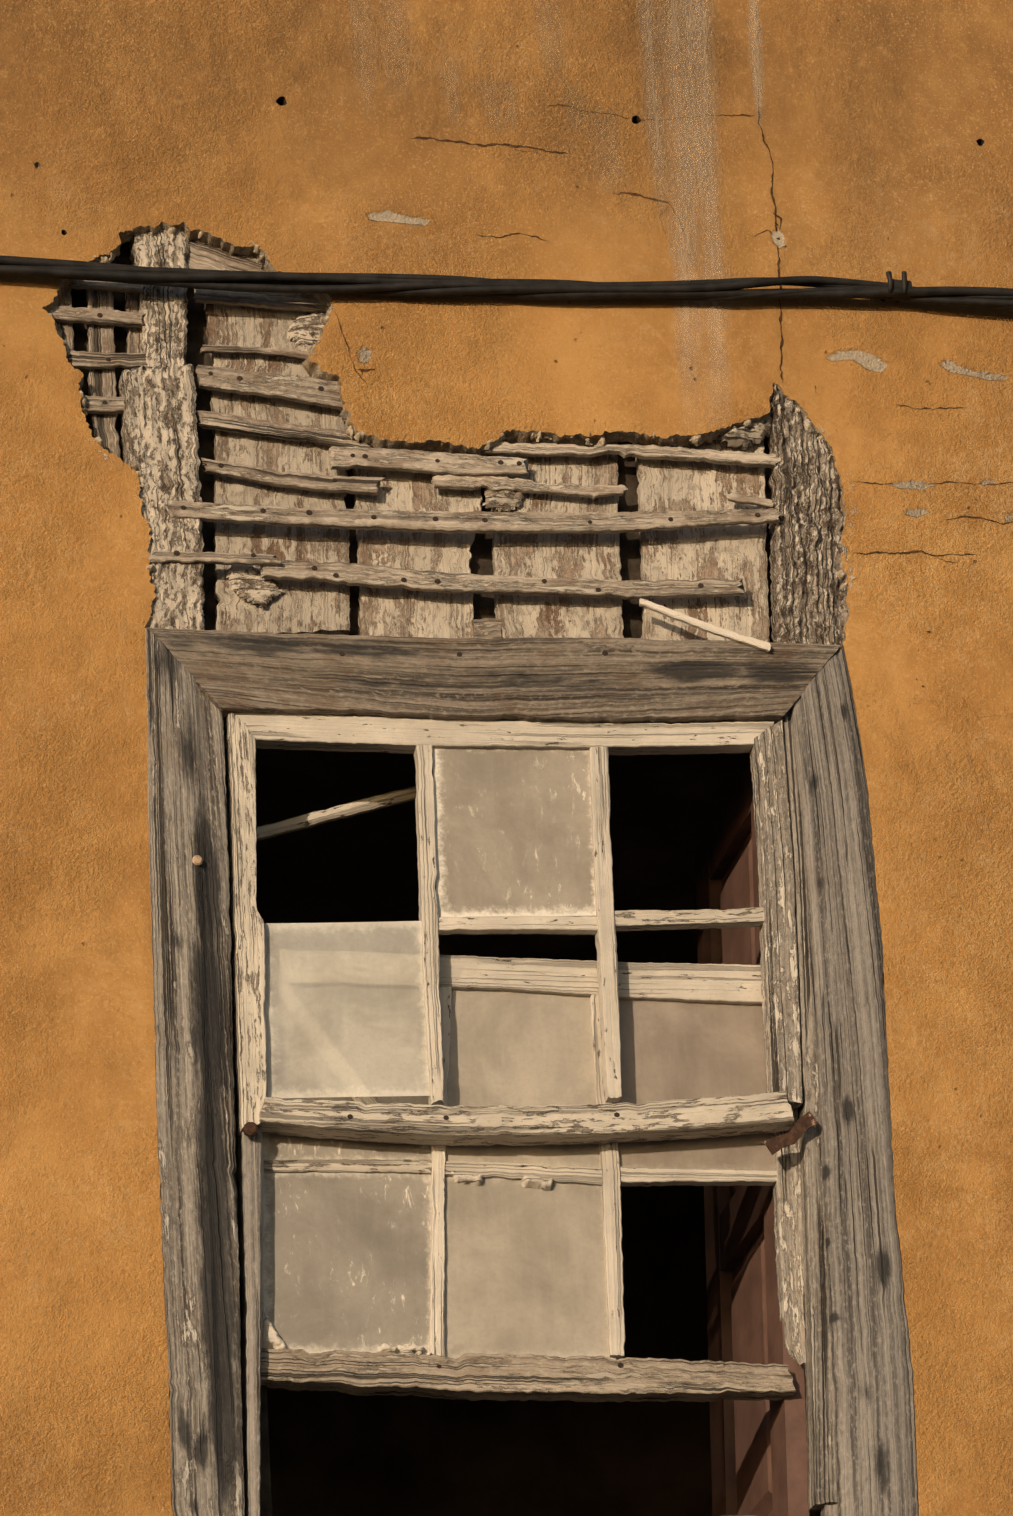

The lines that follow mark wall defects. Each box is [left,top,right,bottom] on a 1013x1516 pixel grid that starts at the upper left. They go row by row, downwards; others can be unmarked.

crack [410,136,565,154]
crack [544,4,784,382]
spalling [89,222,281,272]
peeling [368,210,430,226]
crack [477,233,547,241]
peeling [771,229,786,248]
spalling [42,279,80,361]
peeling [826,350,888,372]
peeling [941,359,1008,380]
spalling [78,376,143,509]
spalling [287,293,856,641]
spalling [226,564,283,607]